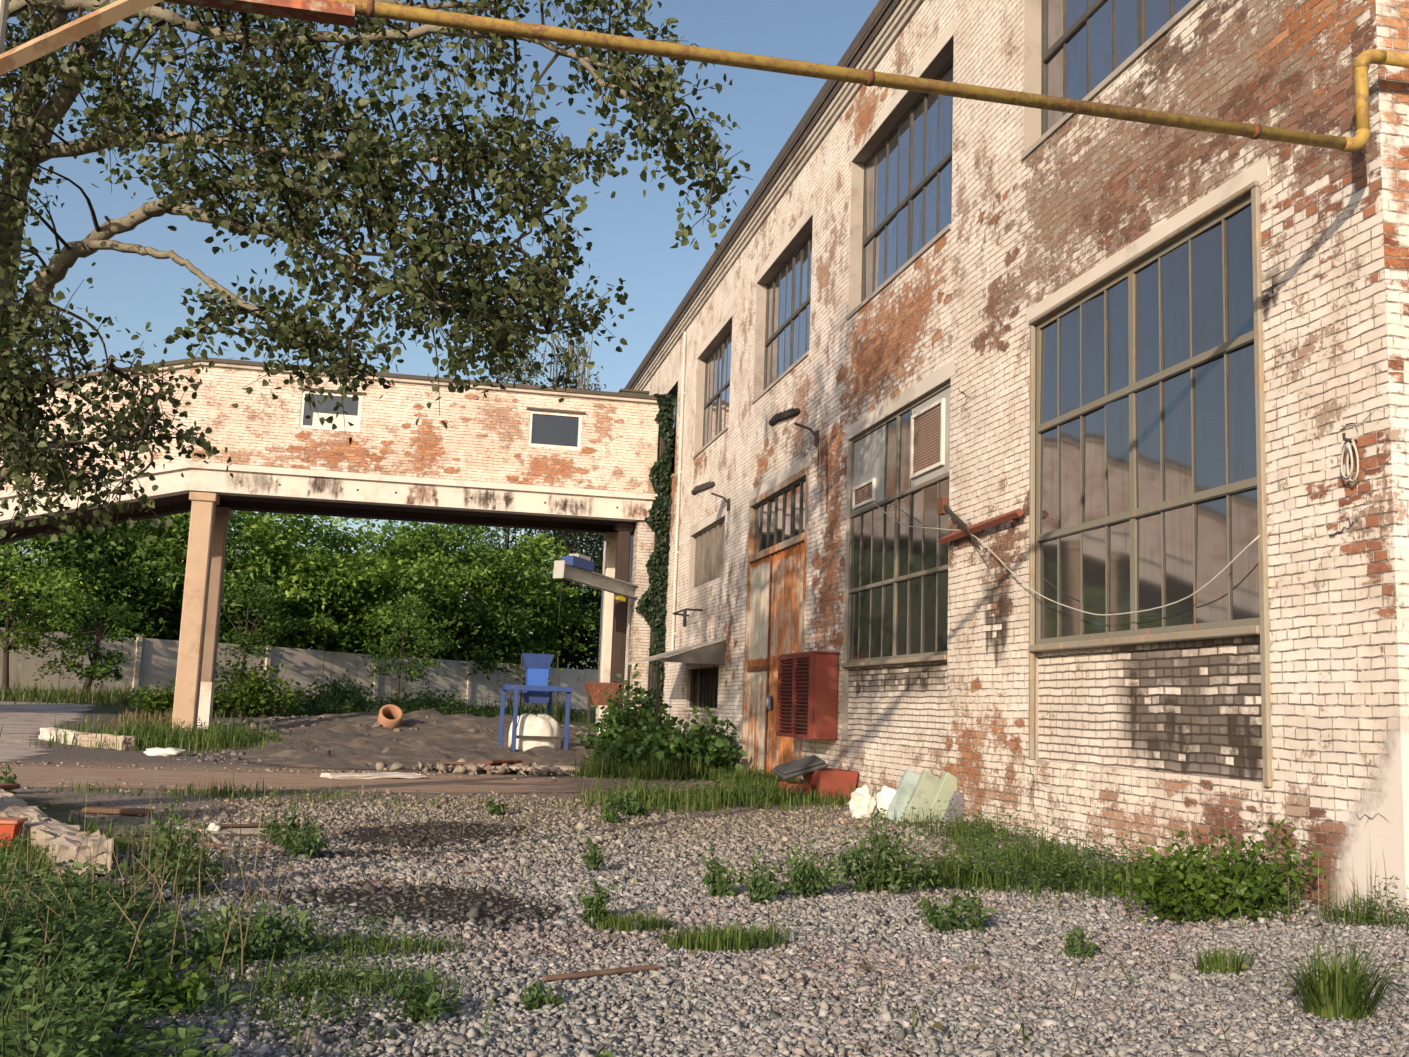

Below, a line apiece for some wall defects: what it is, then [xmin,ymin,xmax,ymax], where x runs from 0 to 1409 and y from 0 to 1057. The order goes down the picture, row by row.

peeling [971,0,1409,355]
water stain [308,477,342,495]
peeling [190,393,624,485]
water stain [465,488,513,510]
peeling [753,235,953,651]
peeling [1388,356,1409,416]
water stain [984,577,1009,668]
peeling [940,693,1028,817]
water stain [1122,636,1263,780]
peeling [1099,779,1347,907]